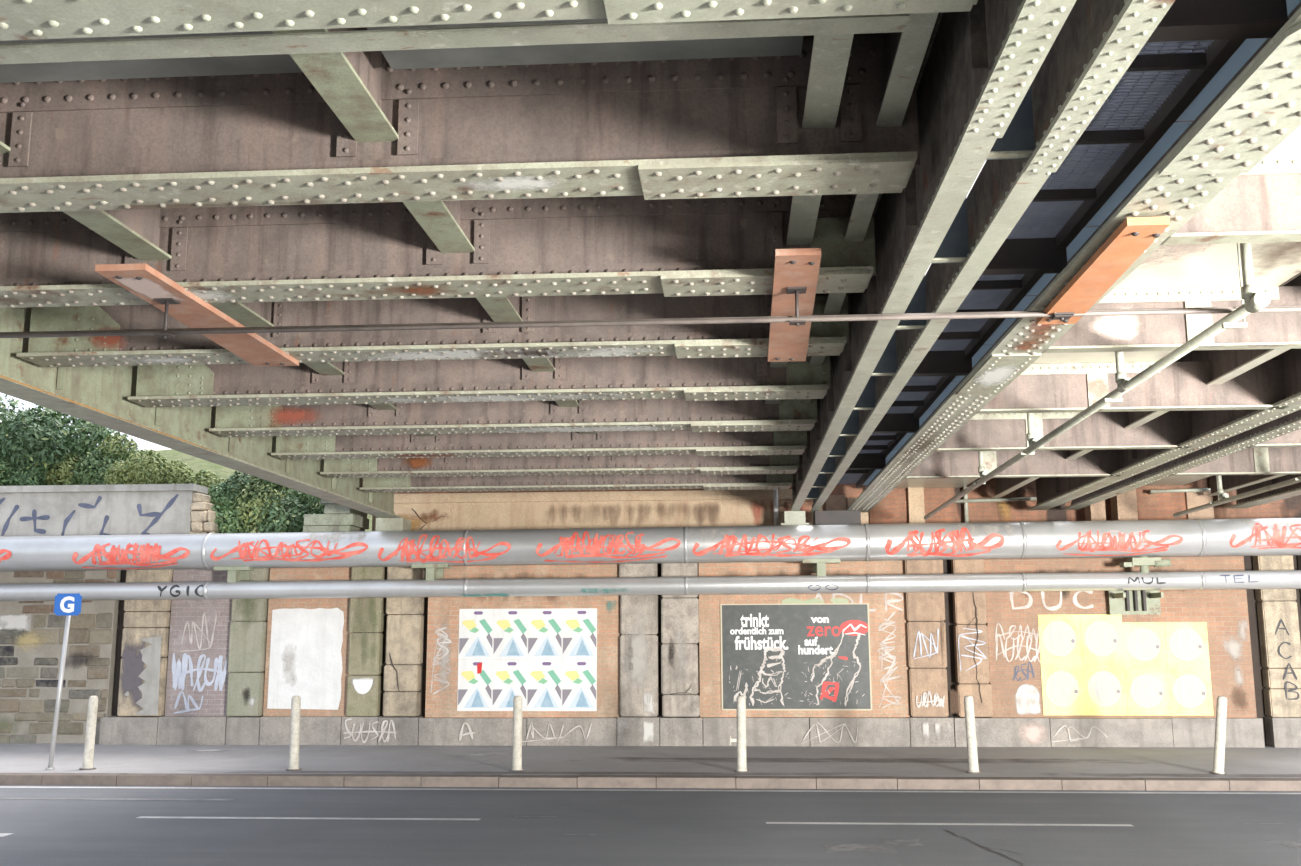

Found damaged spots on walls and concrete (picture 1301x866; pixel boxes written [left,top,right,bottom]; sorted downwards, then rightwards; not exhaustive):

peeling [470,176,554,190]
corrosion [389,287,440,295]
corrosion [273,410,313,422]